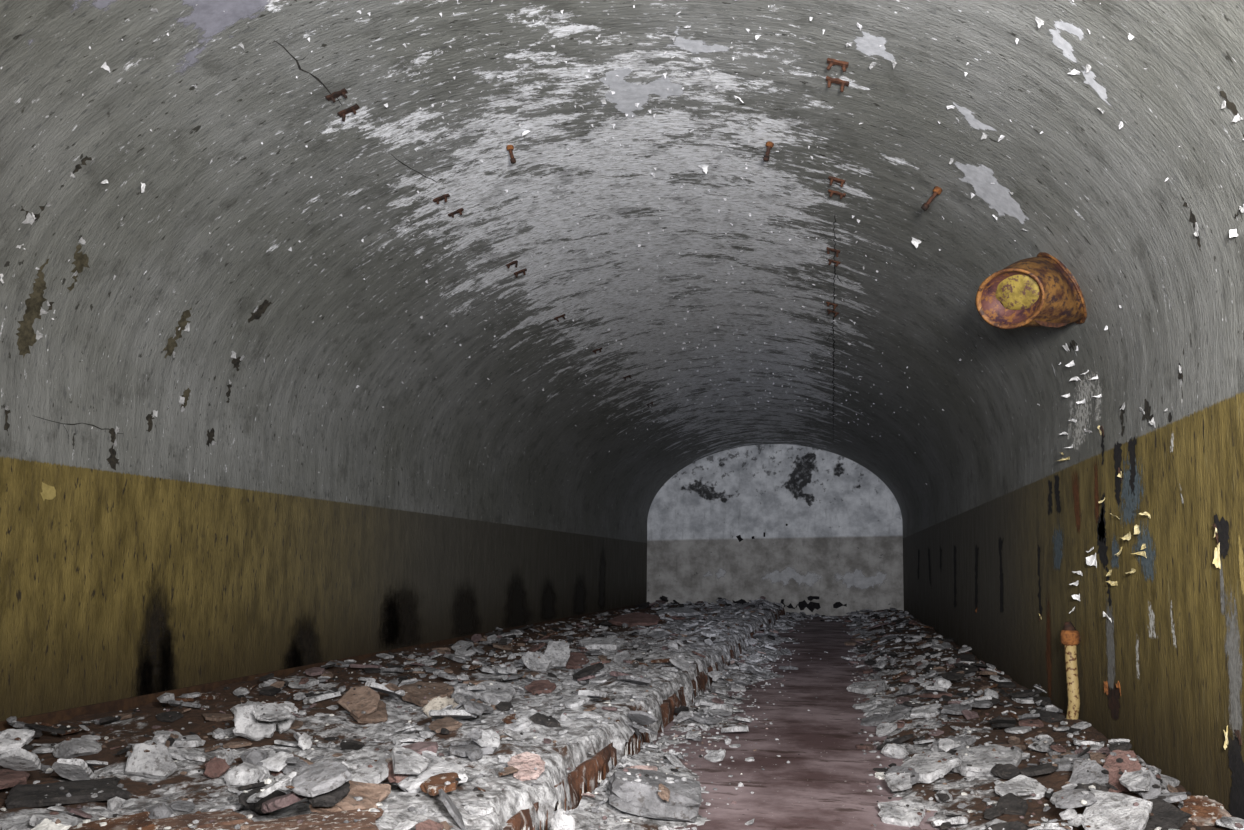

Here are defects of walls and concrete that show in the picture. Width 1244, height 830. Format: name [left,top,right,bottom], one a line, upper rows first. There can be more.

crack [274,40,342,105]
peeling [1035,17,1110,113]
peeling [940,155,1029,241]
spalling [67,237,90,293]
spalling [16,259,54,358]
peeling [599,252,874,430]
spalling [1059,340,1102,404]
spalling [1140,399,1172,427]
peeling [1052,450,1156,614]
peeling [1212,523,1220,568]
damp [137,588,176,696]
damp [285,621,321,669]